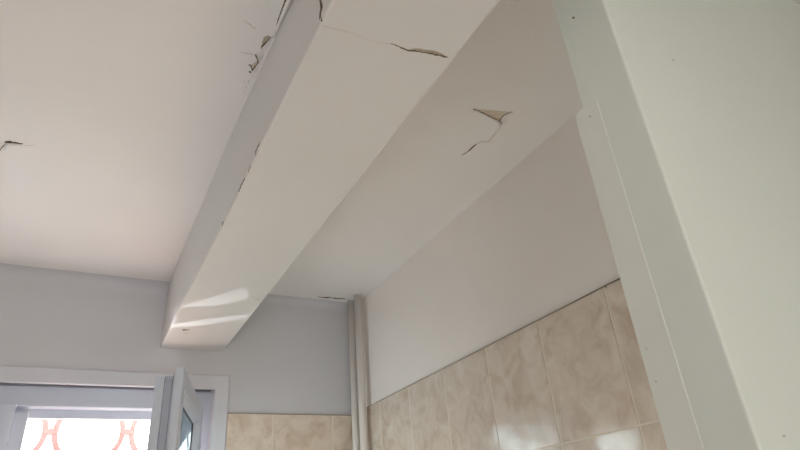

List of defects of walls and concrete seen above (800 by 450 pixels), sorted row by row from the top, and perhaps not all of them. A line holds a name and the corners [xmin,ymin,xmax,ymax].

crack [319,0,448,58]
crack [0,141,32,151]